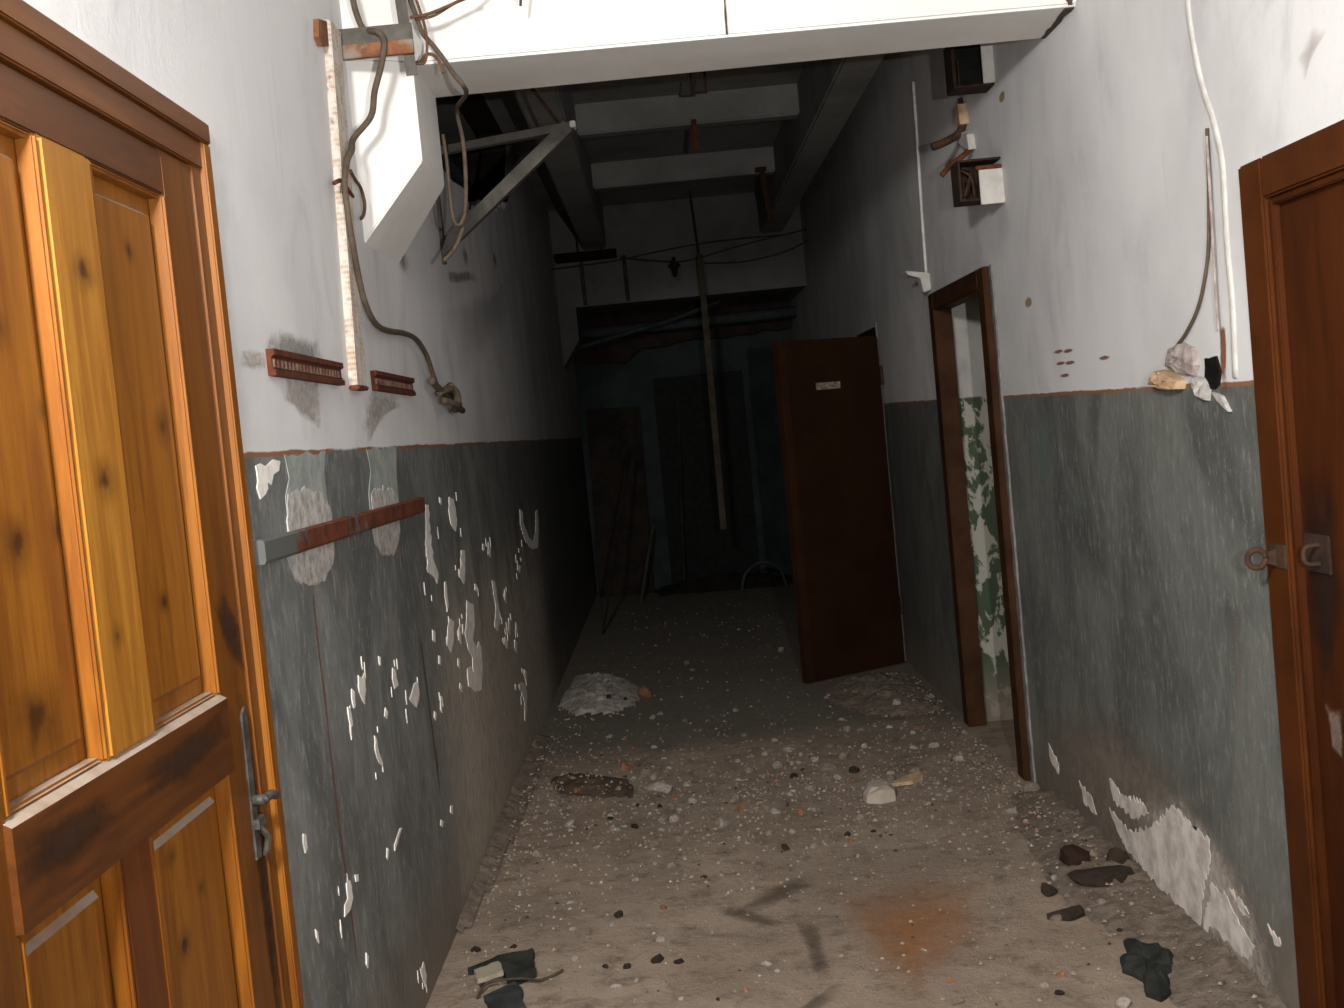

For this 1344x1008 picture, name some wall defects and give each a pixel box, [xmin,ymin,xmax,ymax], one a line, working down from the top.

leakage [279,338,314,357]
peeling [366,397,399,510]
peeling [255,451,332,532]
peeling [287,542,335,586]
peeling [372,520,400,556]
peeling [424,495,518,692]
peeling [347,656,420,779]
peeling [1048,743,1060,774]
peeling [338,874,359,938]
peeling [1079,778,1281,986]
peeling [417,962,427,992]